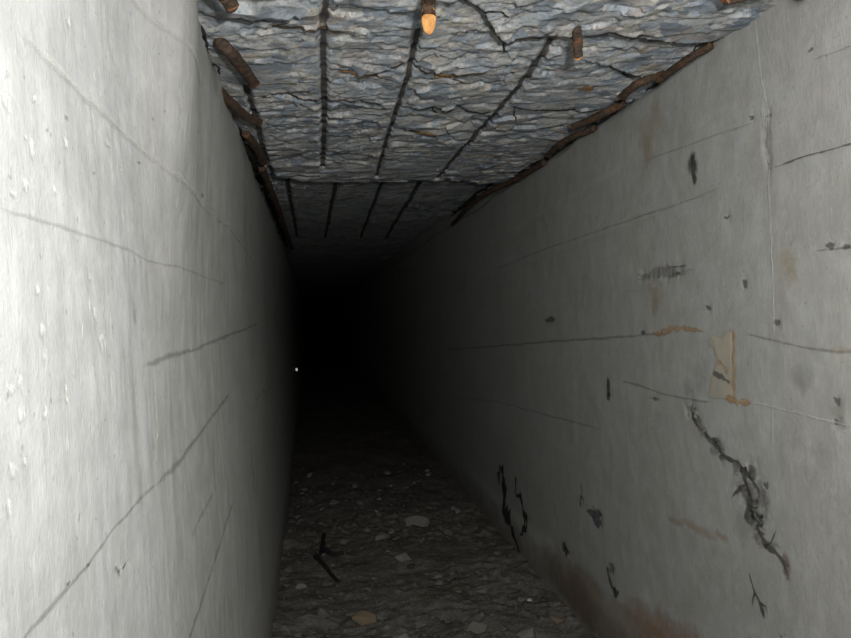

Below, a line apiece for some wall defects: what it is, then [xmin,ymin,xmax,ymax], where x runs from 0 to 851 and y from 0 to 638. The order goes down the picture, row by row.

spalling [218,0,239,13]
spalling [213,37,260,89]
crack [230,18,345,33]
crack [345,64,484,84]
spalling [420,0,436,35]
spalling [572,26,583,60]
crack [450,0,719,57]
spalling [222,87,263,127]
spalling [451,43,714,226]
crack [513,66,666,176]
crack [238,127,288,247]
crack [691,411,788,569]